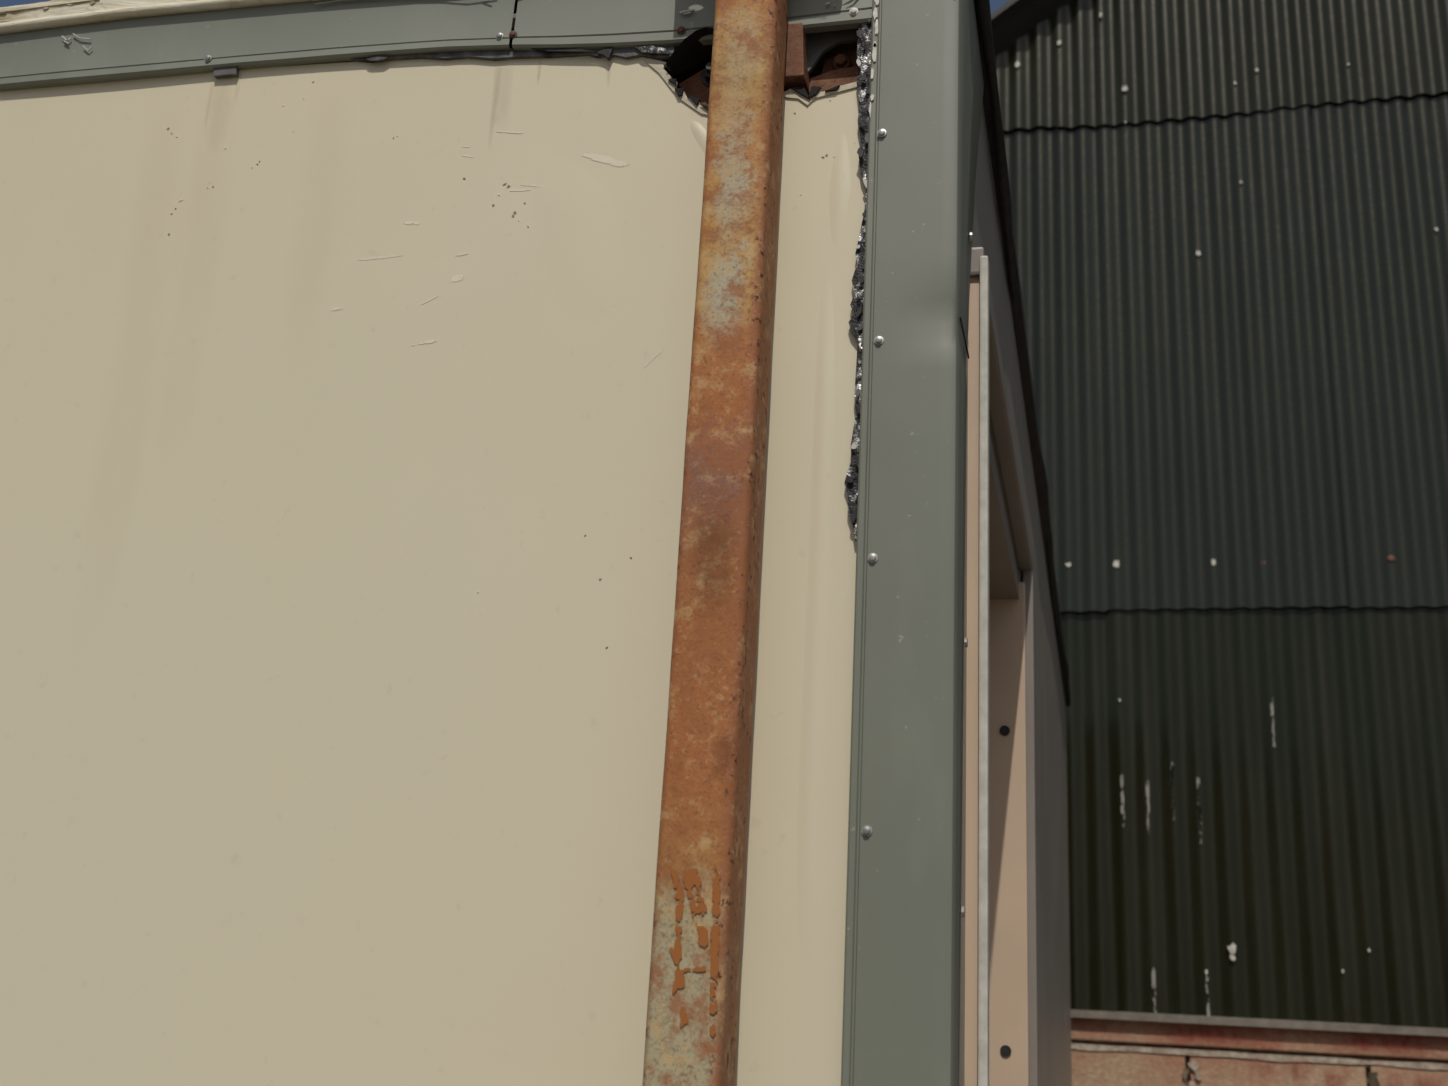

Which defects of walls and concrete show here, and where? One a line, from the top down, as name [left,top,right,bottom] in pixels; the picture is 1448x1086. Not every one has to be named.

rust [669,866,721,1037]